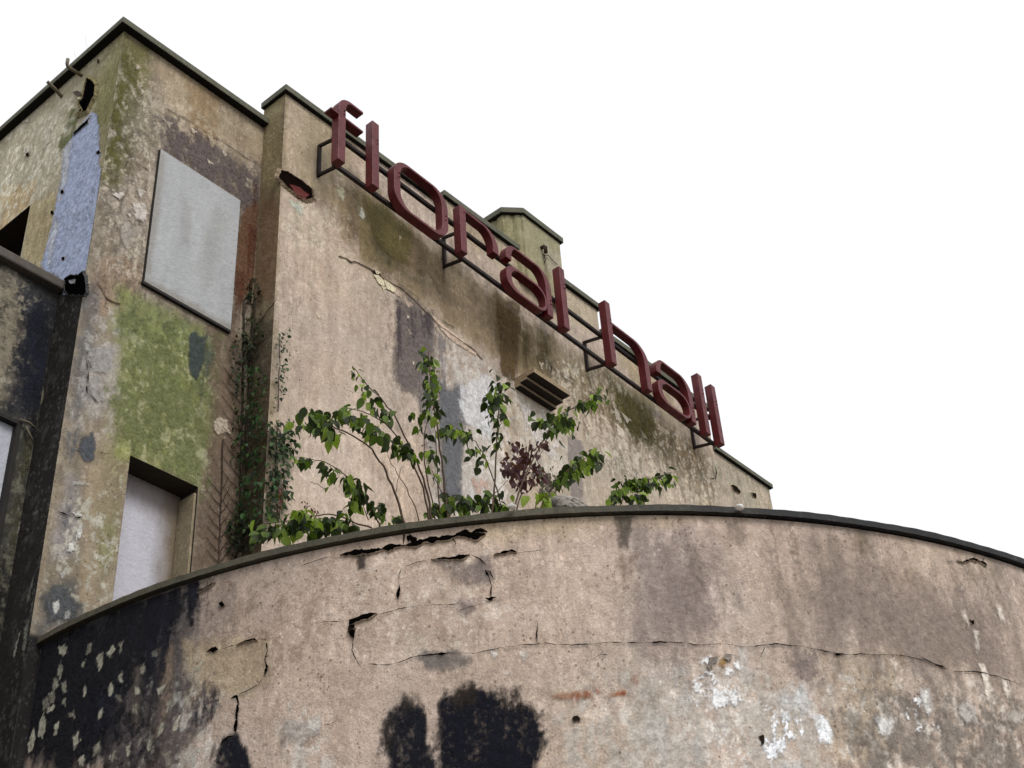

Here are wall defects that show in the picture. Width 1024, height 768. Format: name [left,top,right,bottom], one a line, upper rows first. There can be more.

spalling [73,75,99,136]
spalling [274,167,316,204]
water stain [9,302,48,434]
water stain [189,332,214,386]
crack [338,256,483,360]
crack [304,528,542,669]
peeling [28,644,67,753]
peeling [82,646,115,671]
water stain [26,581,218,768]
crack [207,635,283,743]
water stain [380,681,547,768]
crack [473,620,1023,686]